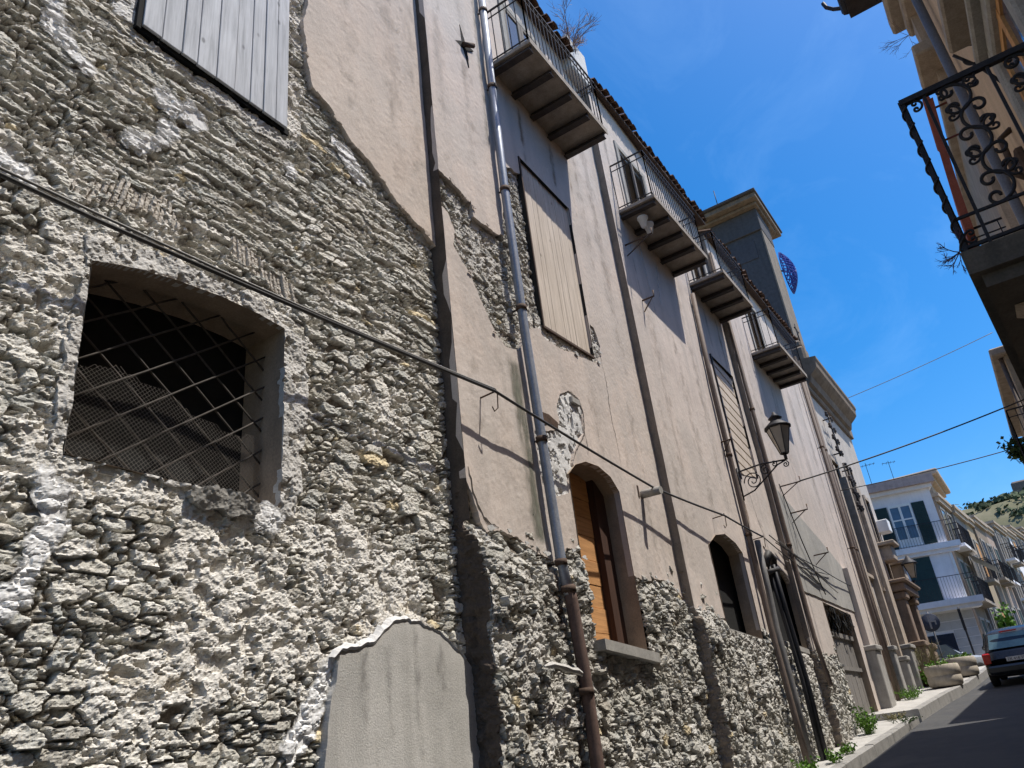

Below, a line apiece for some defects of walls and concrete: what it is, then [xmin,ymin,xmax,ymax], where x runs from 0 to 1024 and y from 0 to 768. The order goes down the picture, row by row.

flaking render [439,169,602,364]
flaking render [534,392,582,496]
rust [552,573,567,640]